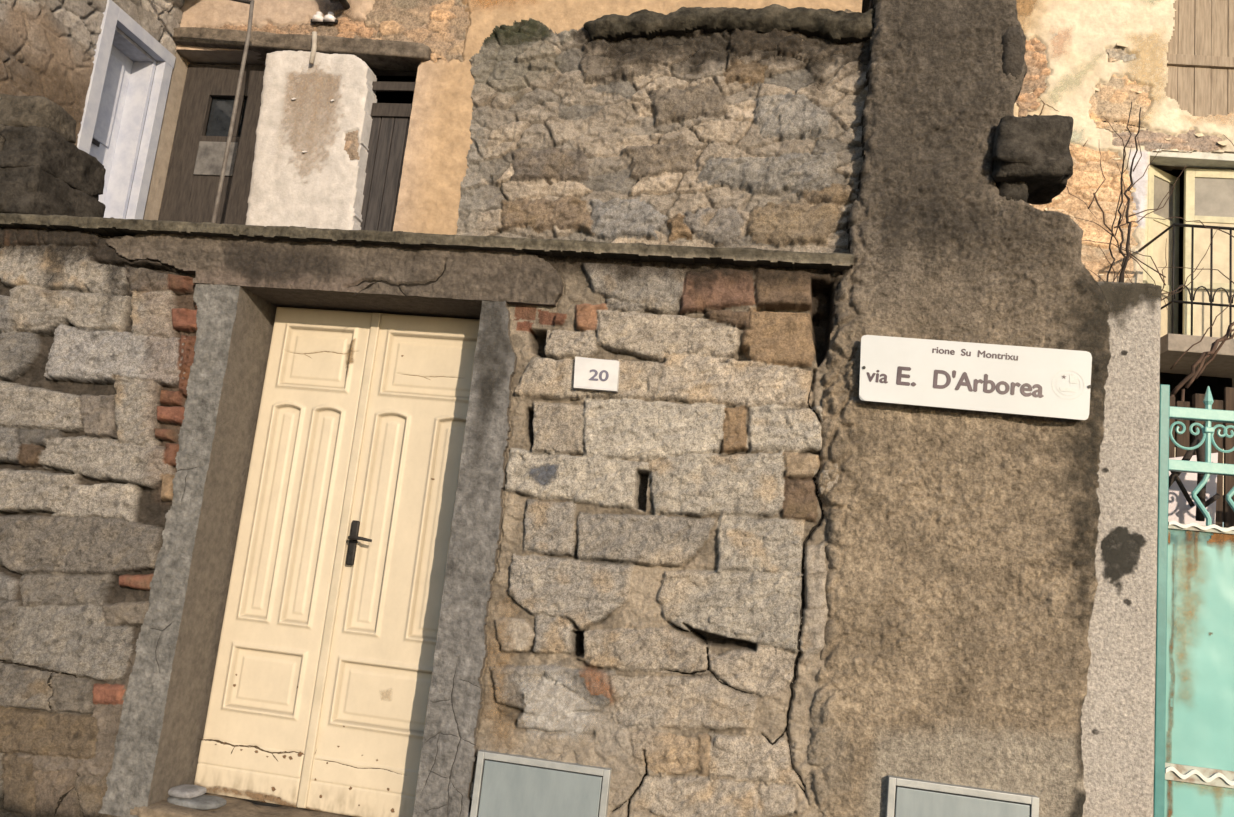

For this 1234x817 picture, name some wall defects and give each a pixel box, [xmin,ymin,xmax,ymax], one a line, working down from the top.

spalling [201,0,470,65]
spalling [1014,38,1051,117]
spalling [1030,41,1227,283]
crack [350,268,445,297]
crack [807,375,821,422]
damp [1101,526,1146,605]
rust [1168,529,1234,544]
crack [667,622,754,694]
crack [762,469,824,793]
crack [197,661,480,815]
crack [613,751,647,817]